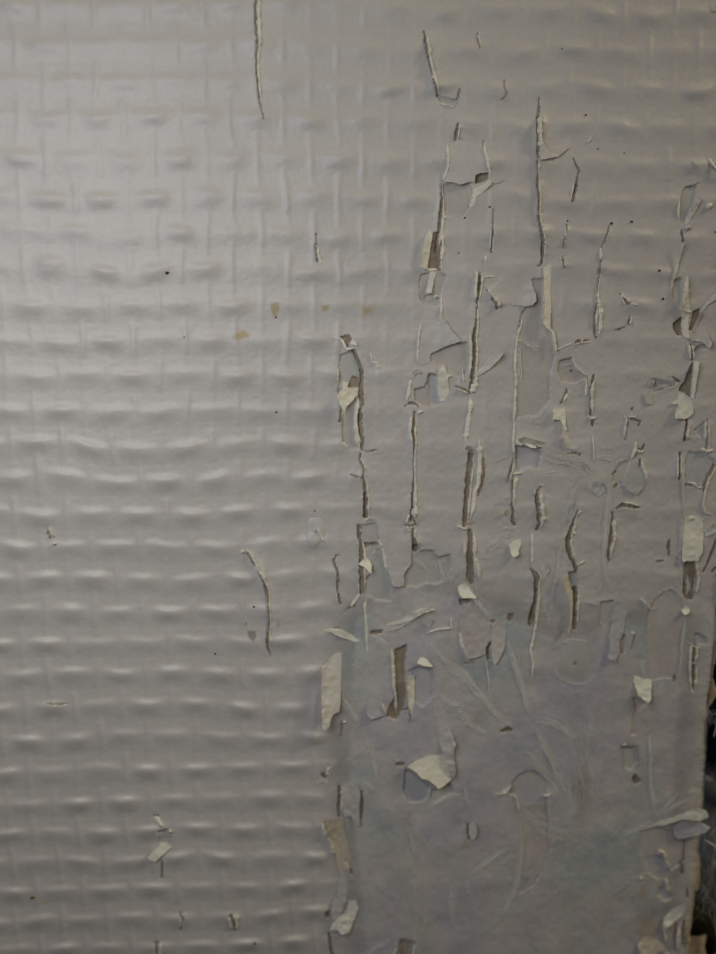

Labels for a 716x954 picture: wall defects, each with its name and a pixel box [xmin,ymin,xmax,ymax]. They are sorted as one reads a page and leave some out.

crack [254,0,264,119]
crack [423,31,461,140]
peeling [418,232,447,305]
peeling [670,243,716,338]
peeling [333,335,379,451]
peeling [406,364,452,407]
peeling [474,279,587,450]
peeling [671,394,694,419]
crack [241,550,272,656]
peeling [321,652,342,730]
peeling [386,645,434,719]
peeling [599,587,686,785]